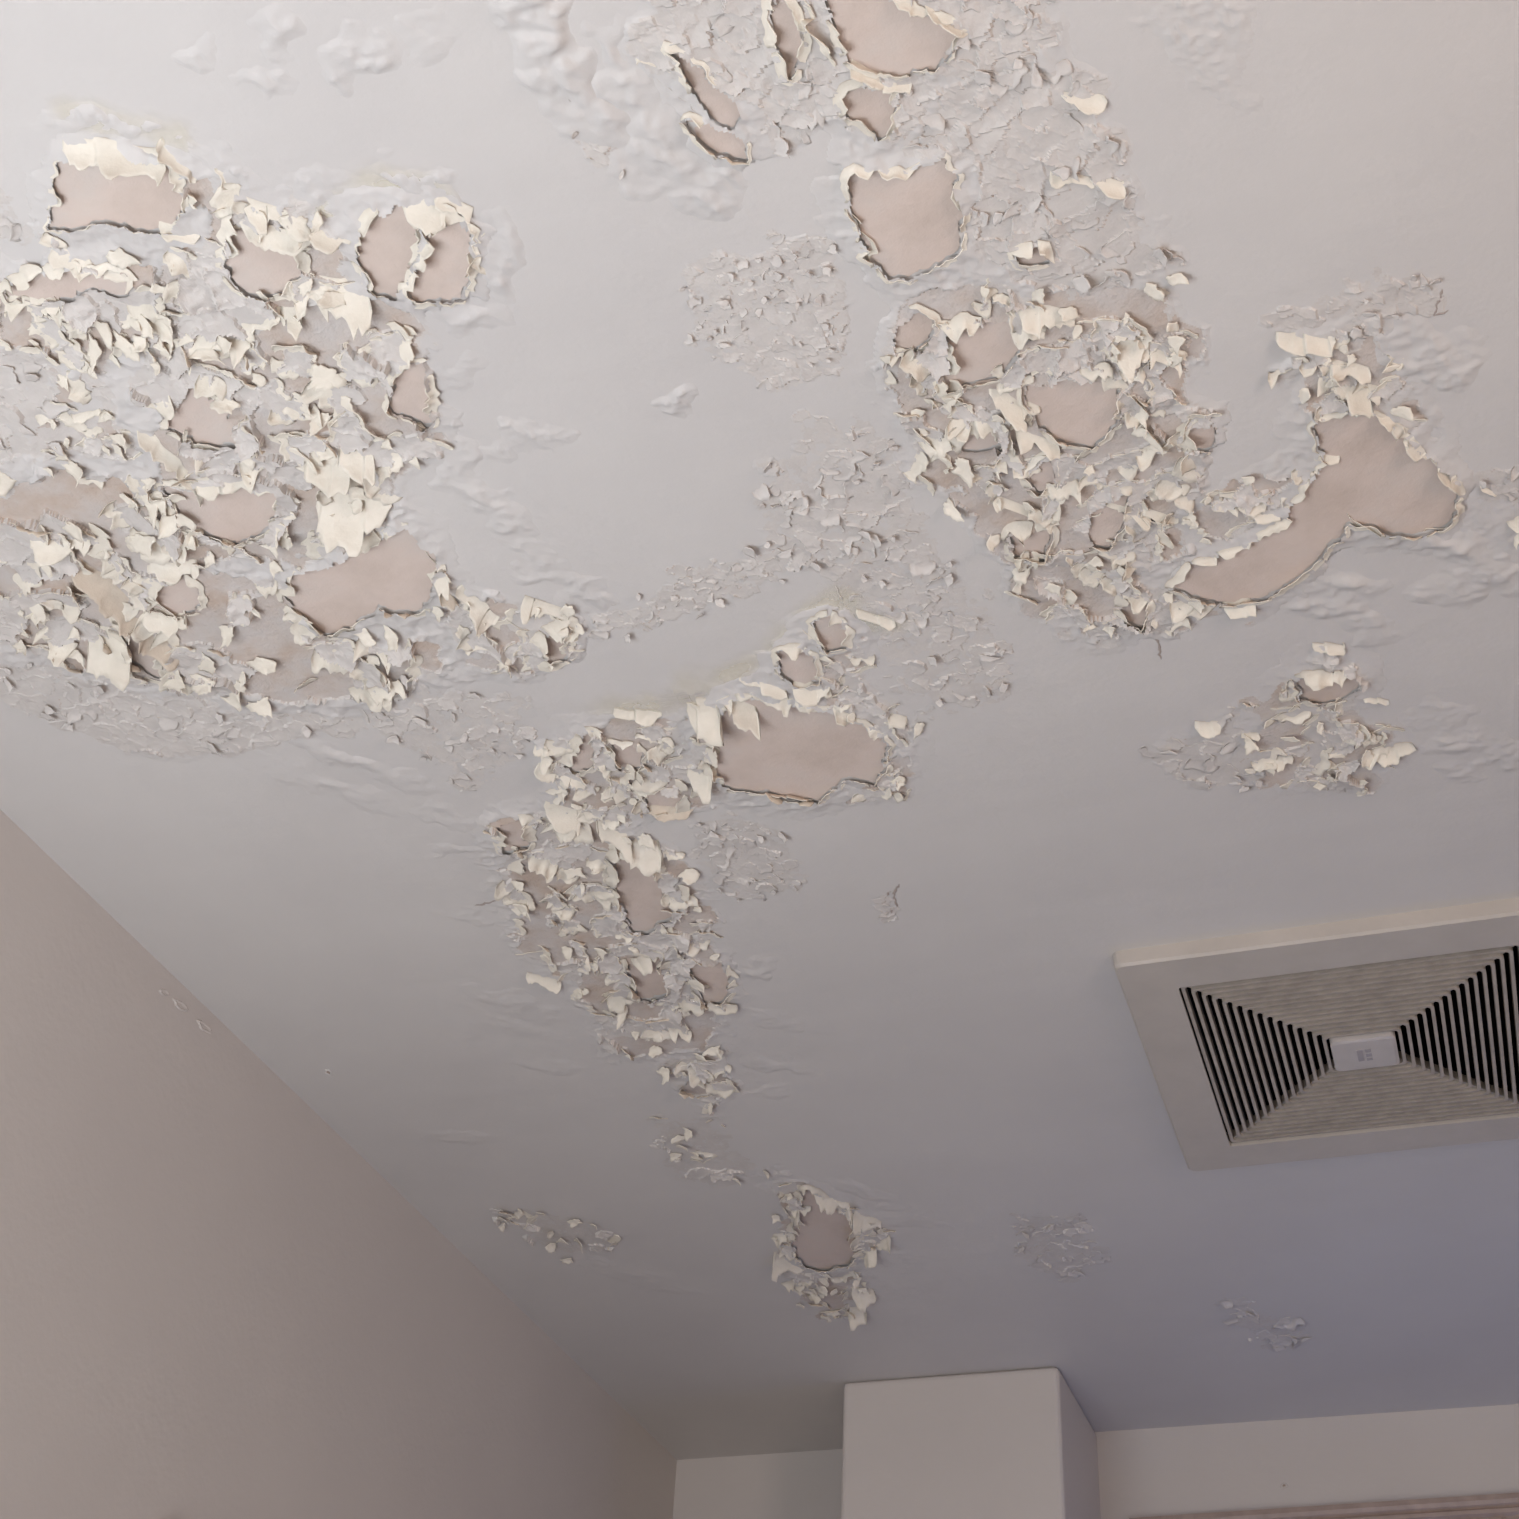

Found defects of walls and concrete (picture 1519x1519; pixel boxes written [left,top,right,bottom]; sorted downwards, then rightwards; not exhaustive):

peeling [617,0,1519,658]
peeling [0,131,1014,1331]
peeling [1136,641,1419,798]